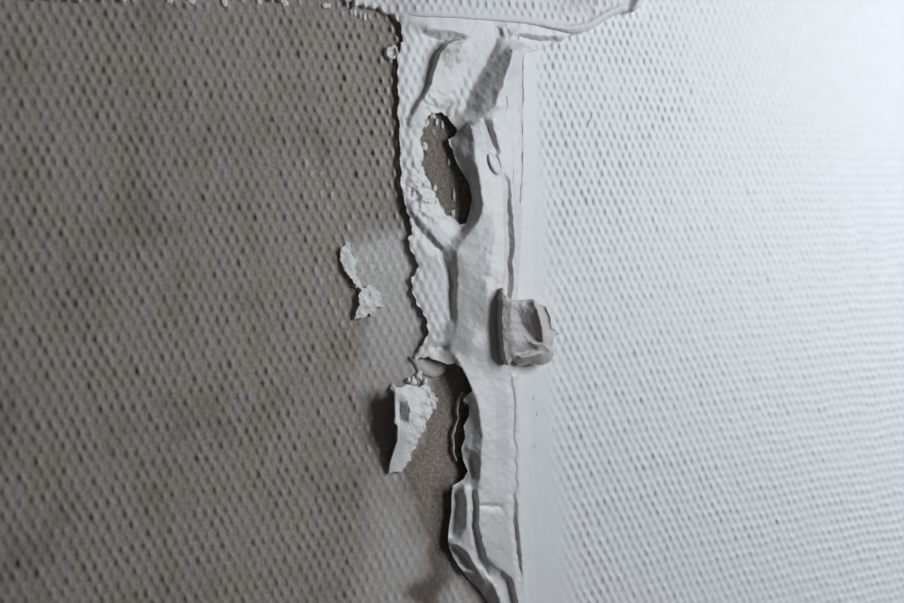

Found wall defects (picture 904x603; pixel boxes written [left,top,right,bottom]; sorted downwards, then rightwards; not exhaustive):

peeling [384,44,399,60]
peeling [421,113,472,224]
peeling [340,242,384,320]
peeling [387,368,470,570]